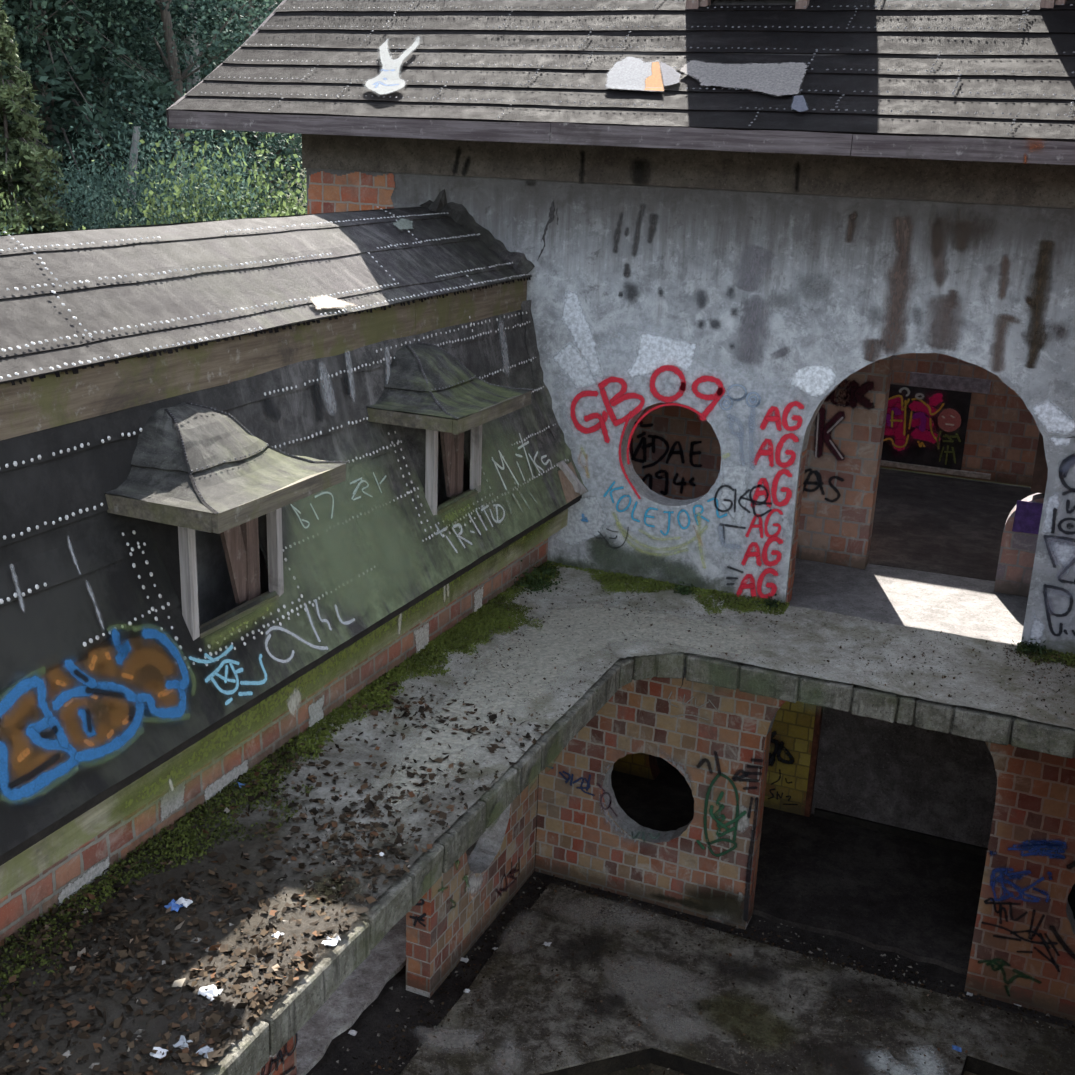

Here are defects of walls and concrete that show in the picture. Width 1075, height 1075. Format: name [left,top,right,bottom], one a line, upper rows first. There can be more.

crack [537,202,559,261]
water stain [613,205,658,302]
water stain [864,217,988,362]
water stain [992,240,1065,372]